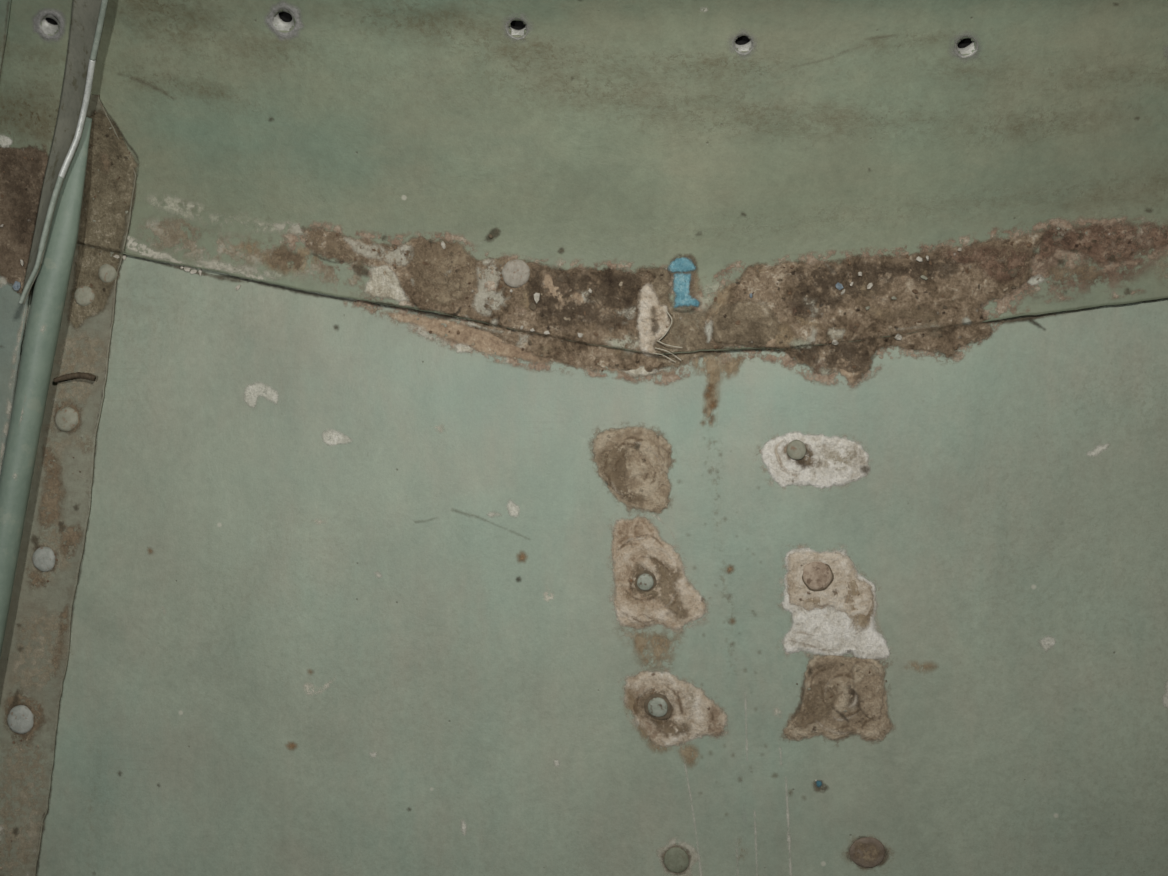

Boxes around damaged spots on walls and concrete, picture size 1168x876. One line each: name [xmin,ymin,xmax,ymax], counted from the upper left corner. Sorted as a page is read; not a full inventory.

peeling [0,135,12,147]
peeling [113,197,518,290]
peeling [344,298,700,385]
peeling [660,255,751,341]
corrosion [263,223,1168,424]
peeling [717,217,1168,387]